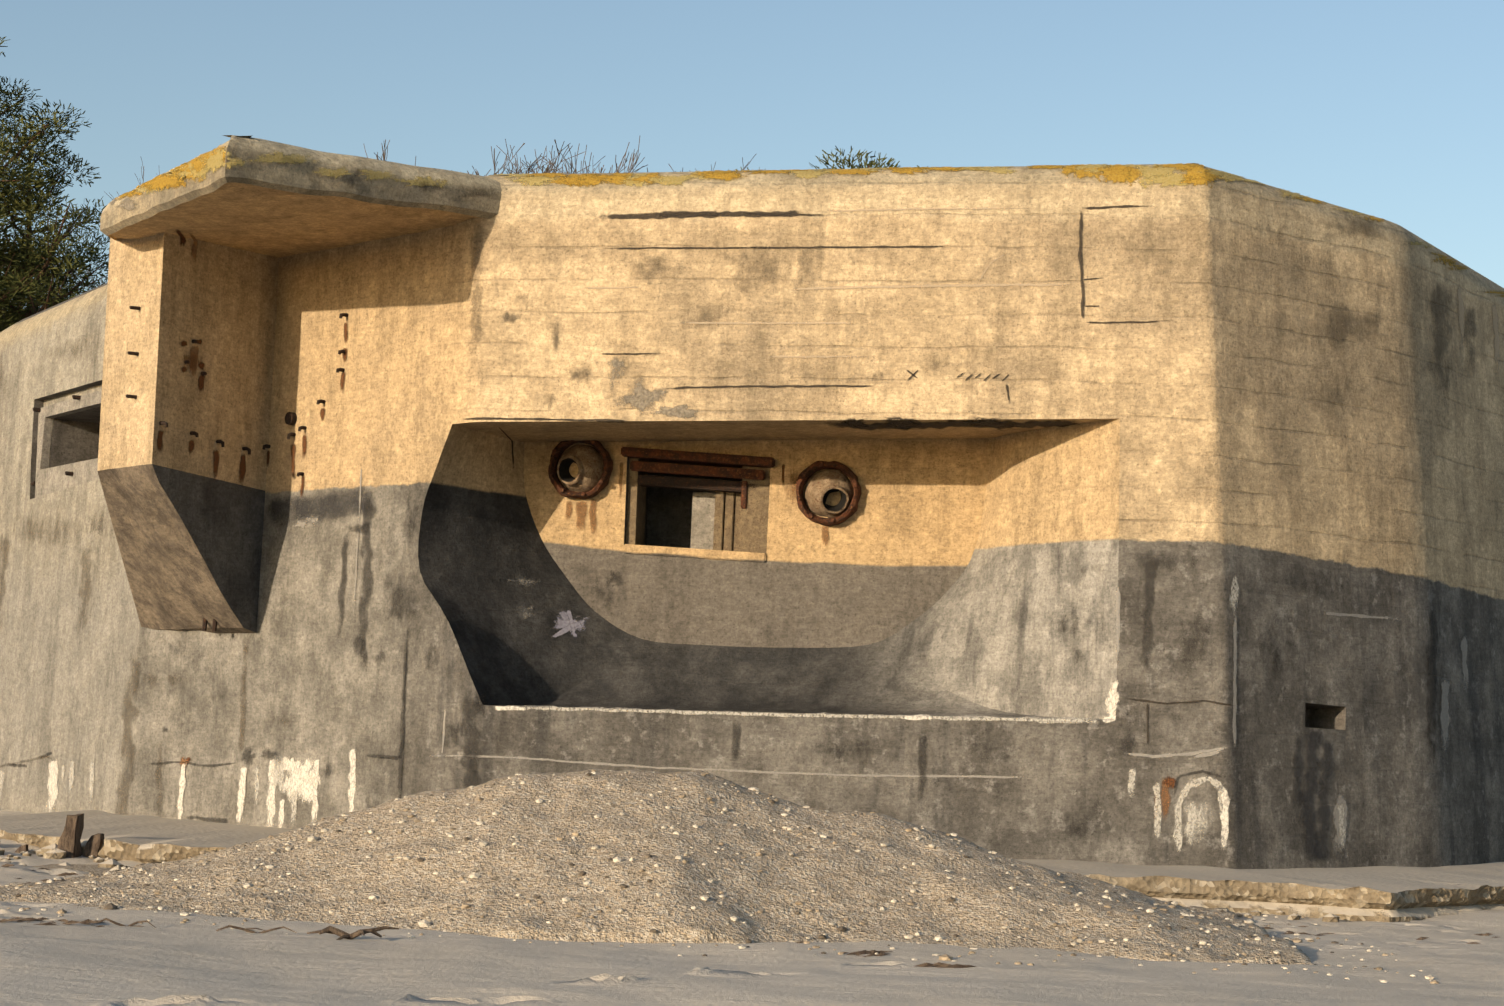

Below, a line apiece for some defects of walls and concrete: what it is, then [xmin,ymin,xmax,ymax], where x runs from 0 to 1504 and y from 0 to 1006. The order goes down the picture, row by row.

rust [176,230,197,259]
crack [608,210,943,249]
crack [1078,205,1167,324]
rust [181,339,205,391]
rust [290,435,306,496]
rust [566,500,596,531]
leakage [41,752,94,812]